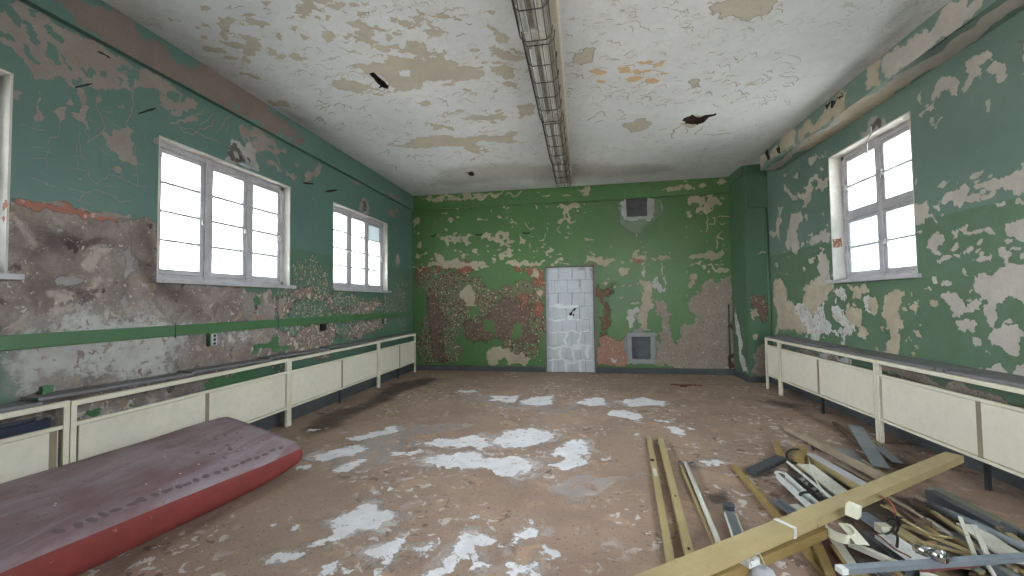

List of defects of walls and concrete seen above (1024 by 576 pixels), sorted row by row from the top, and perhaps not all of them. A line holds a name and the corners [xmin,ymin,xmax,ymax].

crack [32,144,148,204]
crack [171,98,232,143]
peeling [0,0,535,183]
peeling [573,0,1024,408]
peeling [0,186,591,467]